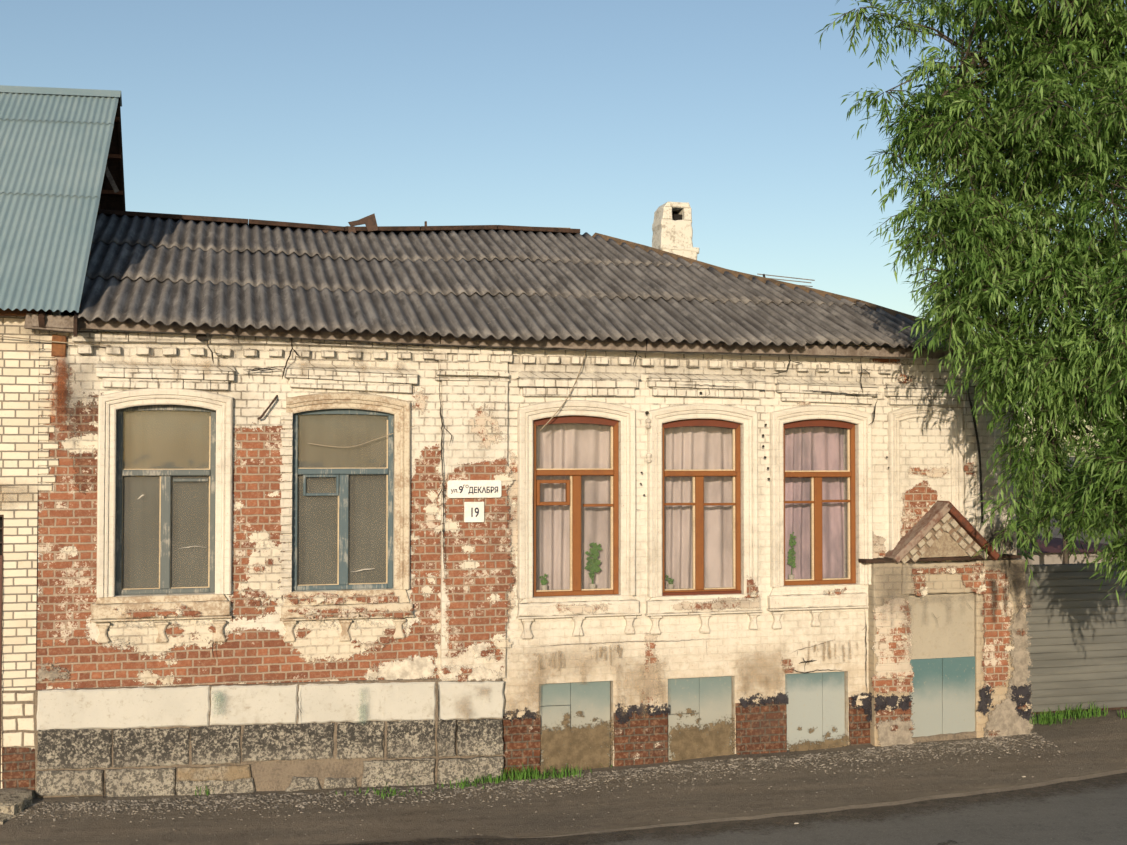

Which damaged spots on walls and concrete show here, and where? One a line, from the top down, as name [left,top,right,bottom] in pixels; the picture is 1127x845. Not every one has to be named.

peeling [36,365,518,690]
peeling [900,463,949,537]
peeling [855,563,1030,731]